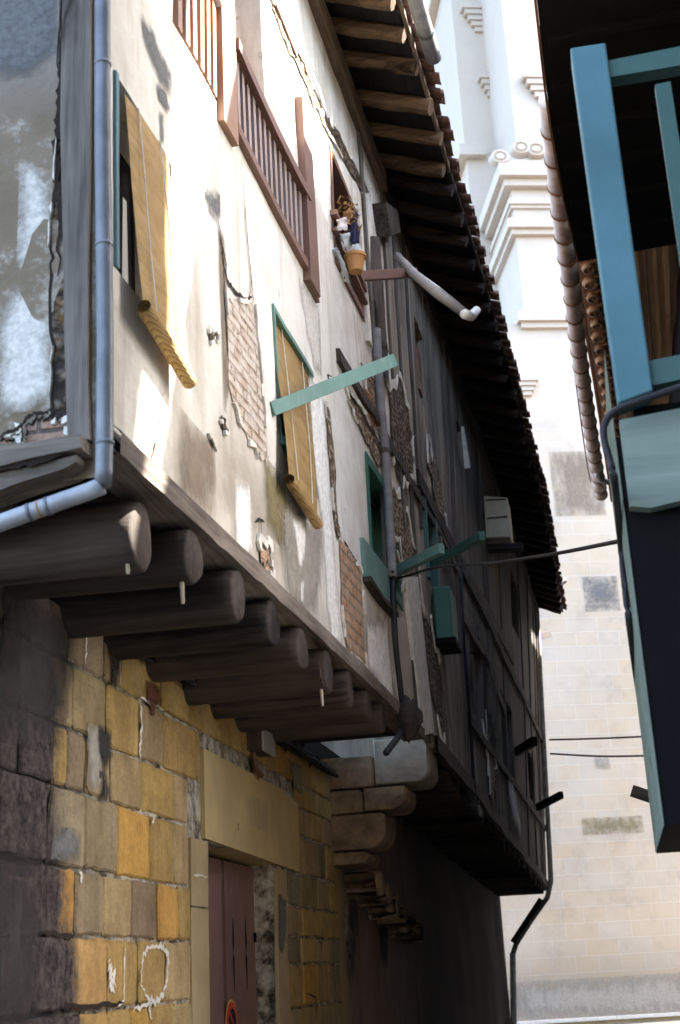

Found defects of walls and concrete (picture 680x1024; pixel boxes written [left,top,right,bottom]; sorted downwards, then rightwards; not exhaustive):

flaking render [0,133,67,444]
flaking render [207,290,269,462]
flaking render [324,401,369,669]
flaking render [345,371,454,744]
damp [551,451,603,516]
damp [582,576,620,612]
damp [584,817,638,834]